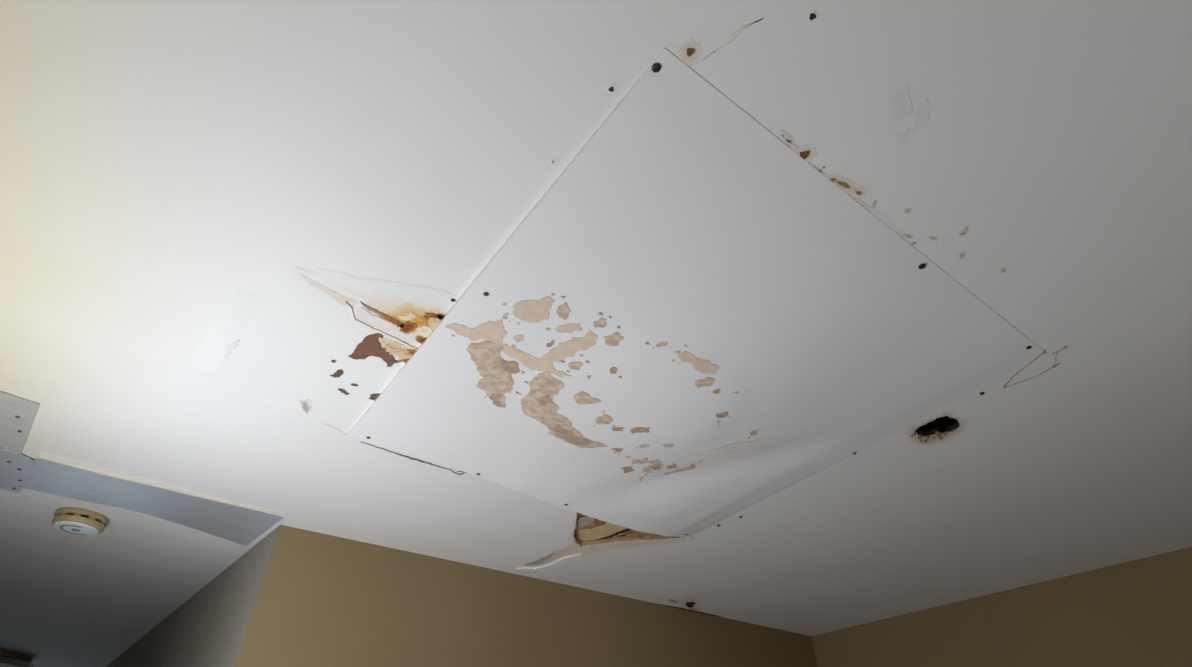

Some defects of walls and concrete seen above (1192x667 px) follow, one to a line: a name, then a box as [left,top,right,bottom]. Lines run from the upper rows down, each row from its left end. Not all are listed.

corrosion [677,39,702,69]
corrosion [779,129,868,198]
corrosion [380,313,444,363]
peeling [330,293,703,482]
hole [902,409,971,448]
spalling [562,512,693,556]